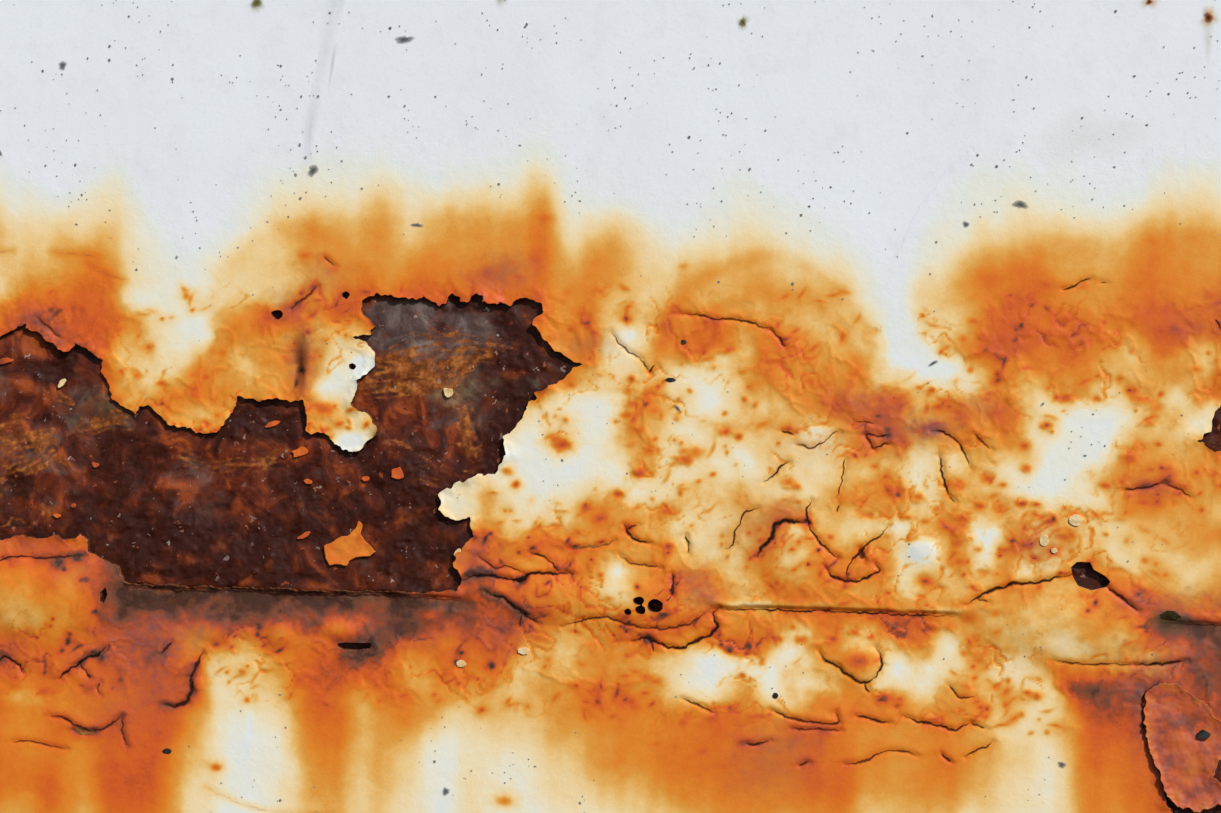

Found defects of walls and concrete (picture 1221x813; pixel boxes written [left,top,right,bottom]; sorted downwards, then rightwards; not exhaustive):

crack [687,313,785,346]
crack [614,335,655,372]
rust [0,132,1093,813]
crack [1109,588,1137,610]
crack [61,649,104,694]
crack [169,656,201,708]
crack [774,651,991,764]
crack [16,715,127,749]
peeling [1143,683,1221,813]
rust [1213,760,1221,784]